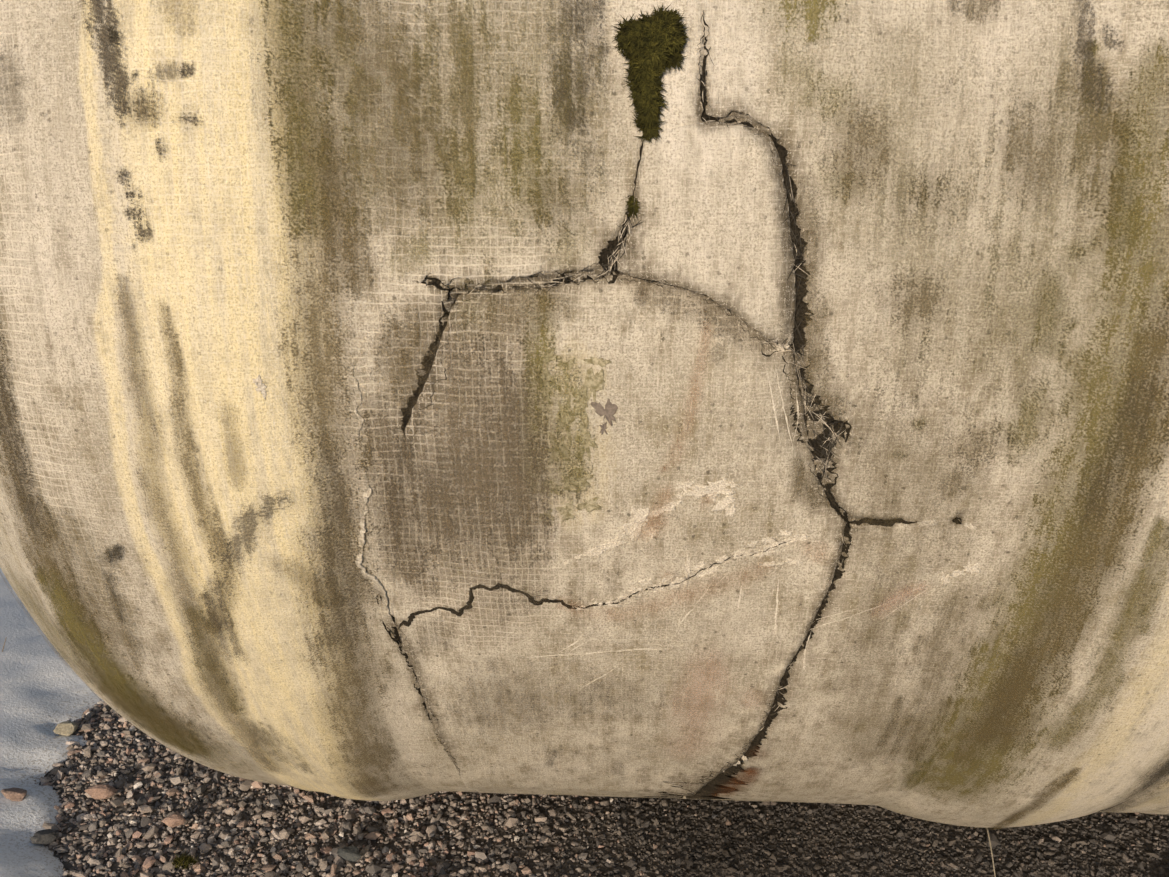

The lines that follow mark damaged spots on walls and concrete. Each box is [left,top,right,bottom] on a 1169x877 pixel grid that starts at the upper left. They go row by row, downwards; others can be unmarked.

leakage [116,169,153,248]
leakage [80,0,194,162]
leakage [823,111,889,201]
mould [1059,0,1130,218]
leakage [877,274,944,333]
leakage [257,0,607,797]
crack [376,10,917,799]
leakage [0,275,306,772]
peeling [562,478,740,565]
peeling [576,530,808,610]
leakage [949,290,1169,762]
leakage [996,768,1082,829]